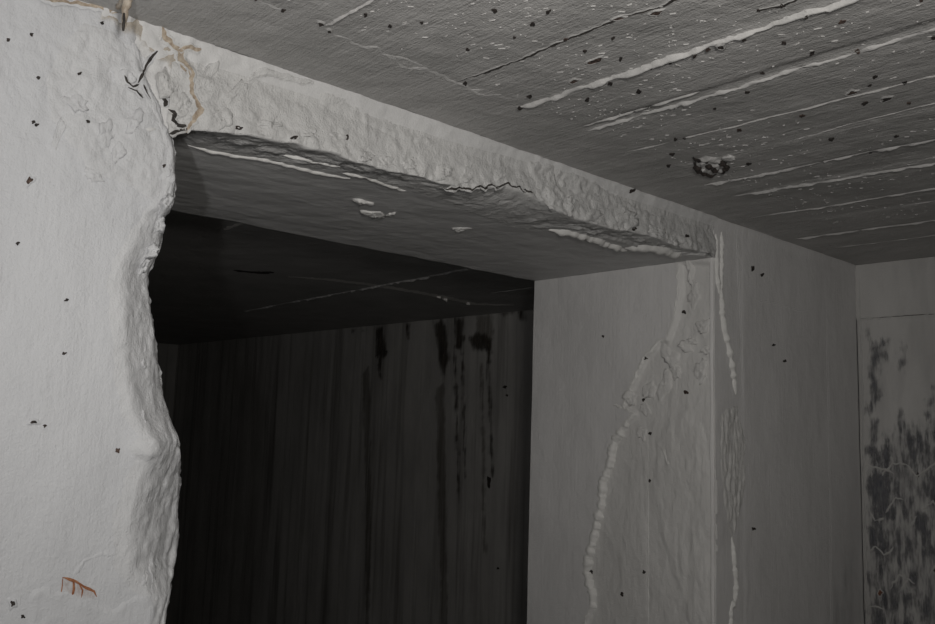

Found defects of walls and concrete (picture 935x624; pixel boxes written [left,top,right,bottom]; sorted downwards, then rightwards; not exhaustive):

crack [123,26,208,138]
crack [334,0,679,96]
peeling [544,3,747,137]
peeling [777,9,853,56]
crack [442,180,533,194]
spalling [636,107,808,197]
spalling [36,21,737,624]
damp [436,318,491,374]
damp [869,340,885,409]
damp [865,413,935,574]
rust [61,577,97,598]
crack [729,537,740,624]